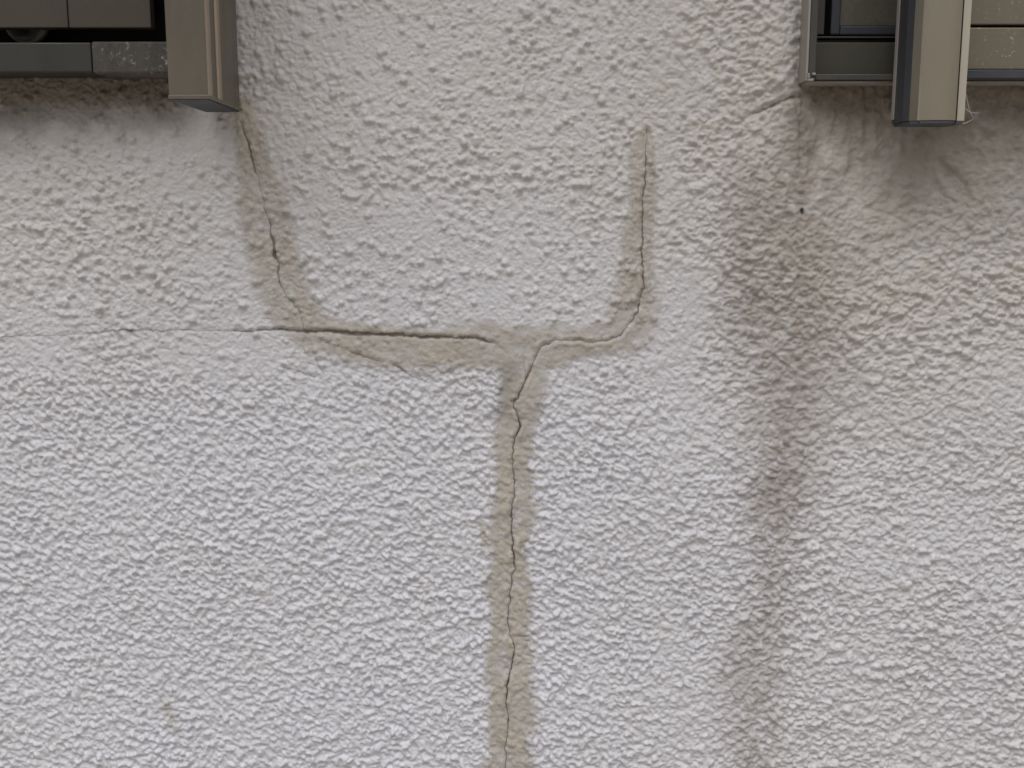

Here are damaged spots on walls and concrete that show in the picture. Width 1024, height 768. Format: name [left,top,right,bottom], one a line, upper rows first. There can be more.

crack [244,132,259,178]
crack [241,220,491,343]
crack [504,136,648,768]